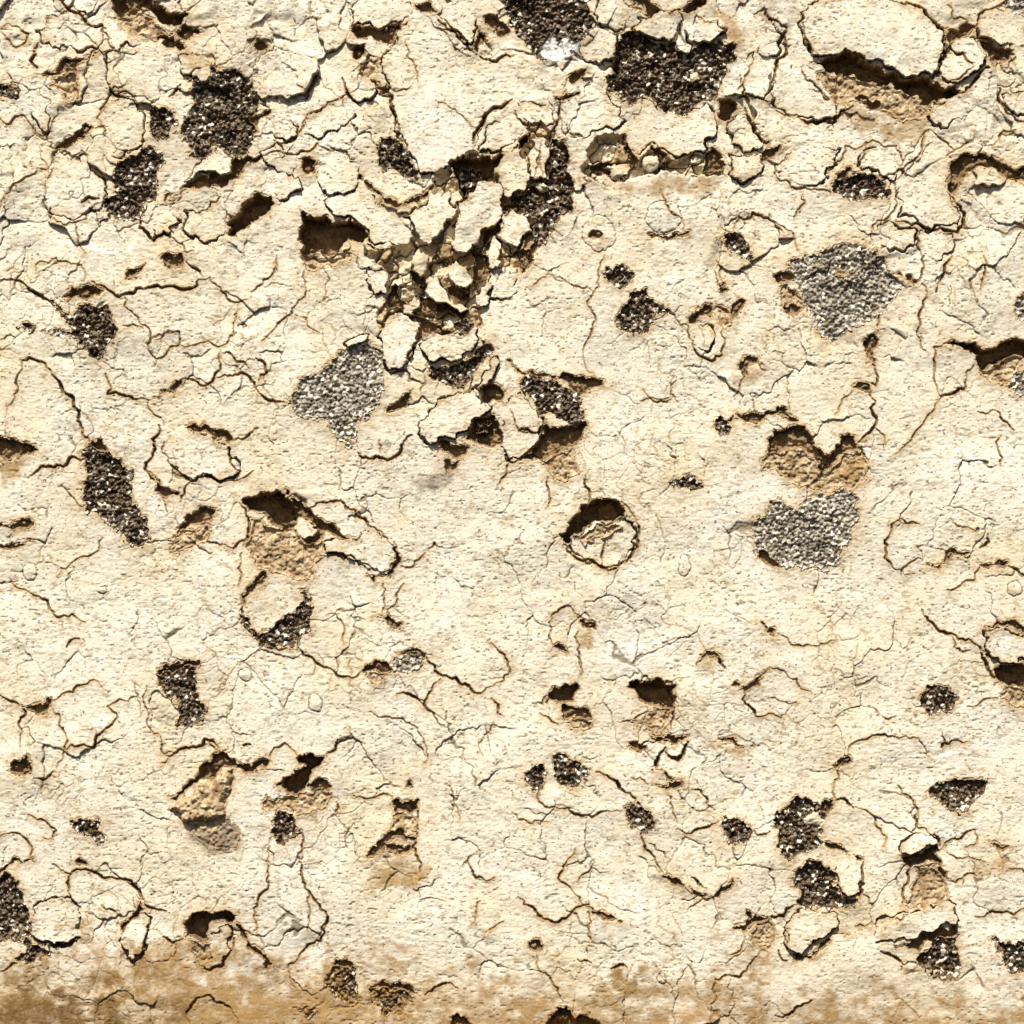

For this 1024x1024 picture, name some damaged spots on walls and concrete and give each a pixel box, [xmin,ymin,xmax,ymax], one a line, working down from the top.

crack [0,107,319,403]
peeling [0,0,1024,485]
crack [734,9,976,458]
spalling [78,421,241,556]
crack [105,373,362,680]
spalling [239,486,405,651]
spalling [712,405,870,575]
crack [0,680,298,782]
crack [511,693,720,836]
spalling [0,855,82,965]
crack [0,815,271,1024]
spalling [732,793,865,963]